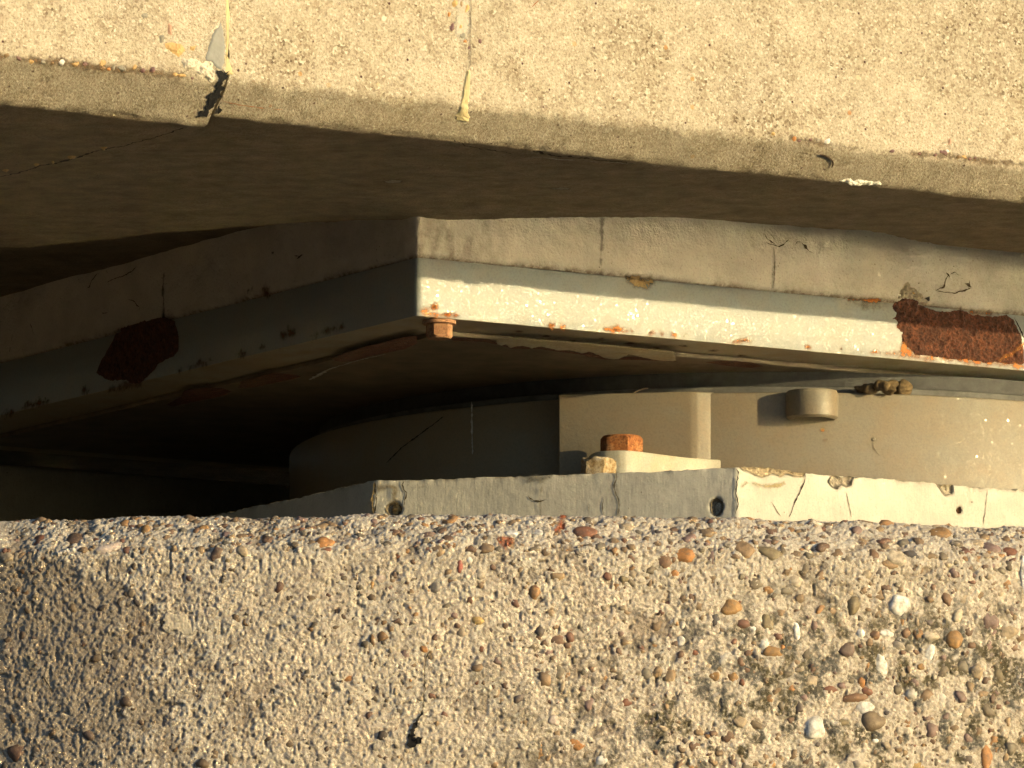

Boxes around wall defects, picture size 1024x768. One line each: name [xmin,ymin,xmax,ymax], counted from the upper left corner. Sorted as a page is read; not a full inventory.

spalling [0,20,225,83]
corrosion [96,317,179,392]
corrosion [848,298,1024,369]
crack [588,476,619,513]